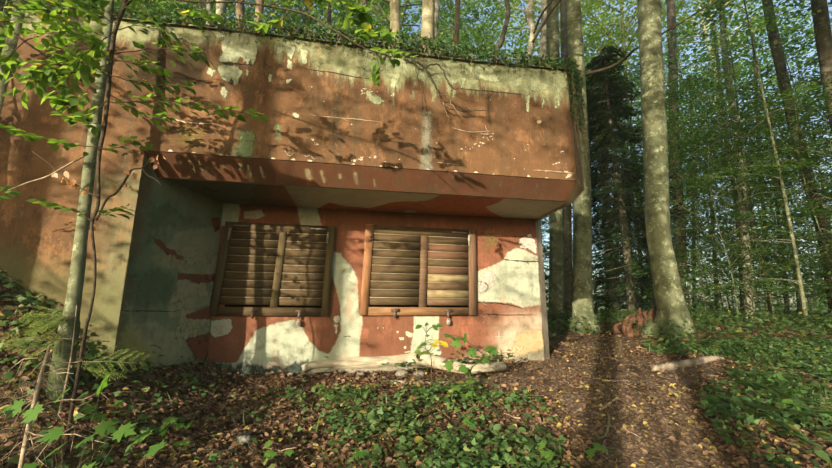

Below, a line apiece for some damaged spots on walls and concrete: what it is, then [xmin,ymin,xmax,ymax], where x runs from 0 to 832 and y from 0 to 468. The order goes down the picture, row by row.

peeling [207,28,257,97]
peeling [361,53,568,124]
crack [458,87,523,95]
peeling [519,234,537,253]
peeling [178,273,215,283]
peeling [479,270,496,293]